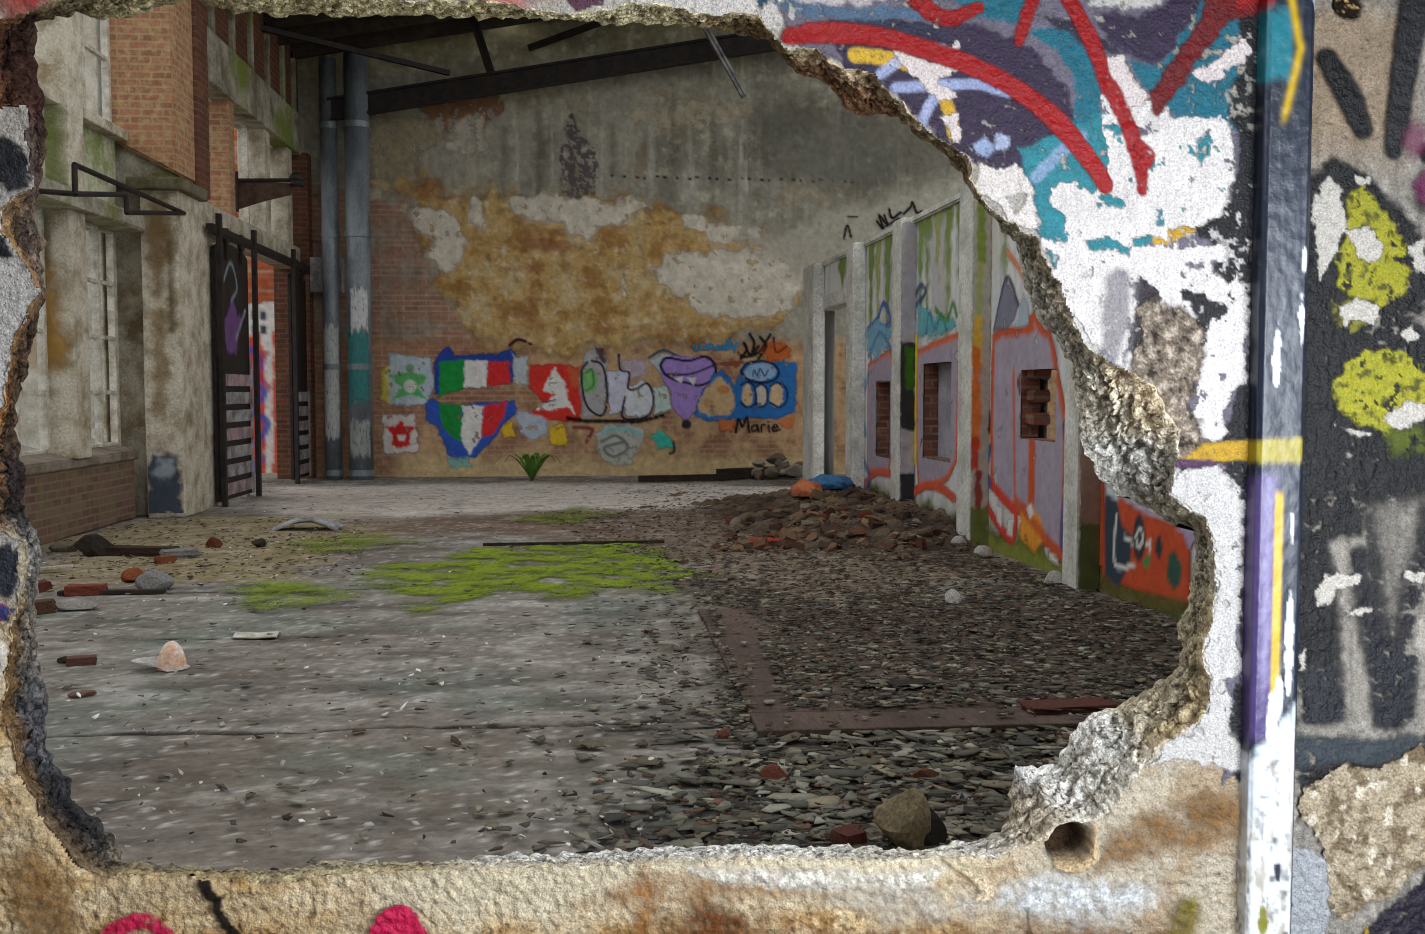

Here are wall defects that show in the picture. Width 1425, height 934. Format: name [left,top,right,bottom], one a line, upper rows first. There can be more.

peeling [893,50,957,100]
peeling [1192,38,1252,83]
flaking render [627,88,753,130]
flaking render [369,95,854,360]
peeling [612,607,665,653]
peeling [277,784,306,804]
peeling [519,797,567,828]
flaking render [1291,743,1425,934]
crack [198,880,241,934]